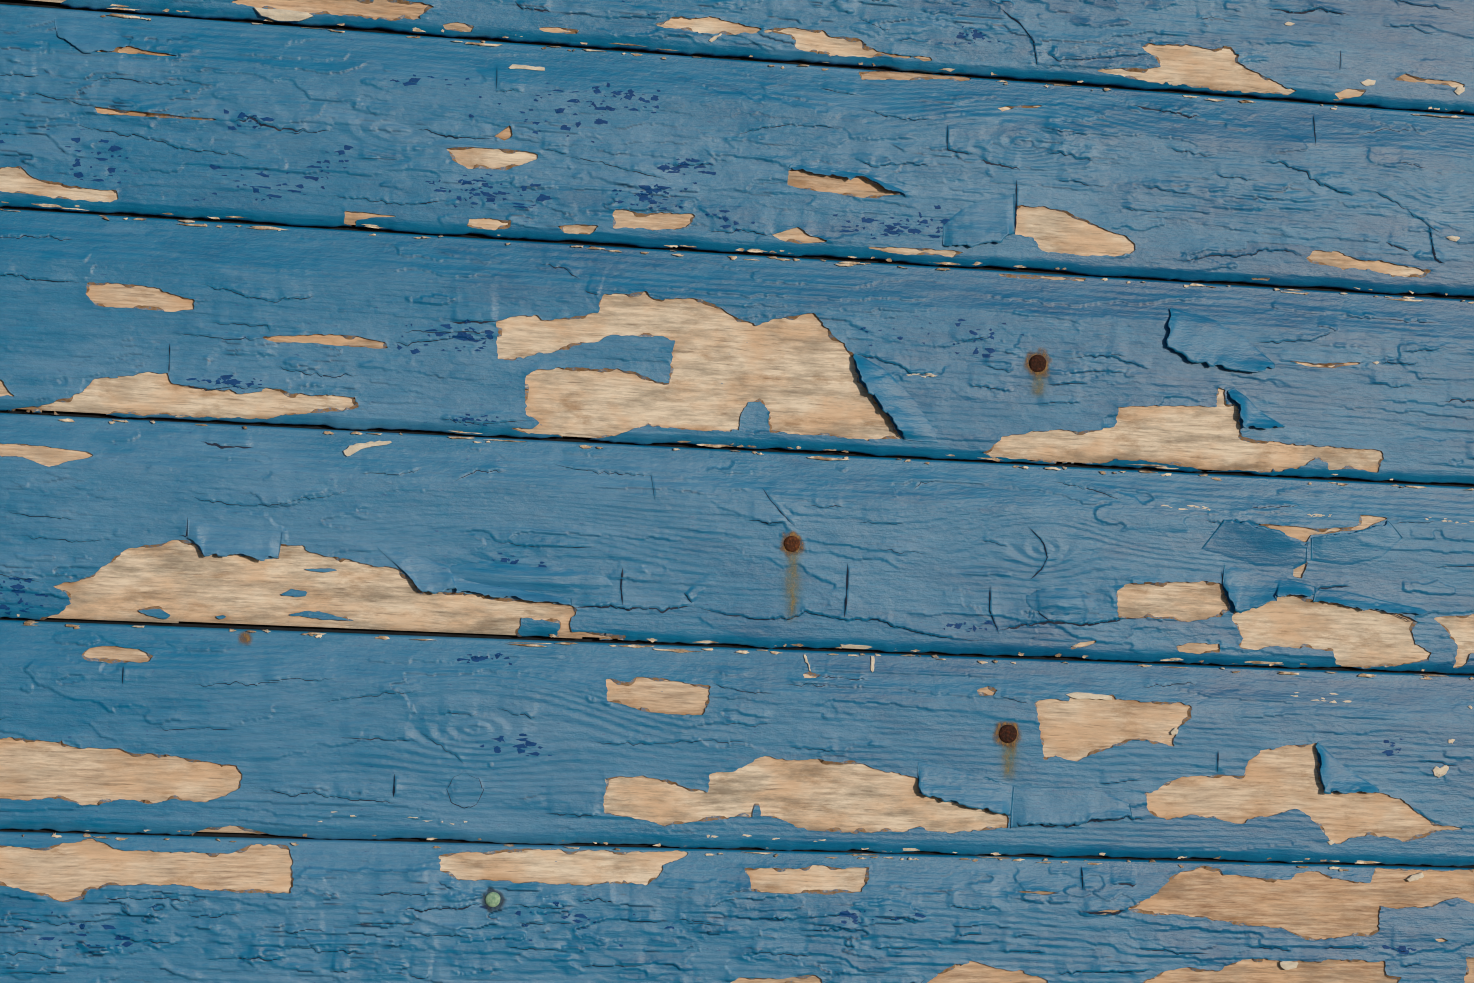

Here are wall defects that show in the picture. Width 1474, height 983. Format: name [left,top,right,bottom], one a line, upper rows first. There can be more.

crack [740,88,1019,230]
crack [1043,105,1445,264]
peeling [263,291,955,461]
peeling [981,308,1426,489]
peeling [0,519,719,665]
crack [575,489,1136,641]
peeling [1116,505,1474,703]
peeling [0,737,242,806]
rust [995,722,1020,773]
crack [219,892,723,973]
peeling [408,743,1474,983]
crack [747,905,1209,983]